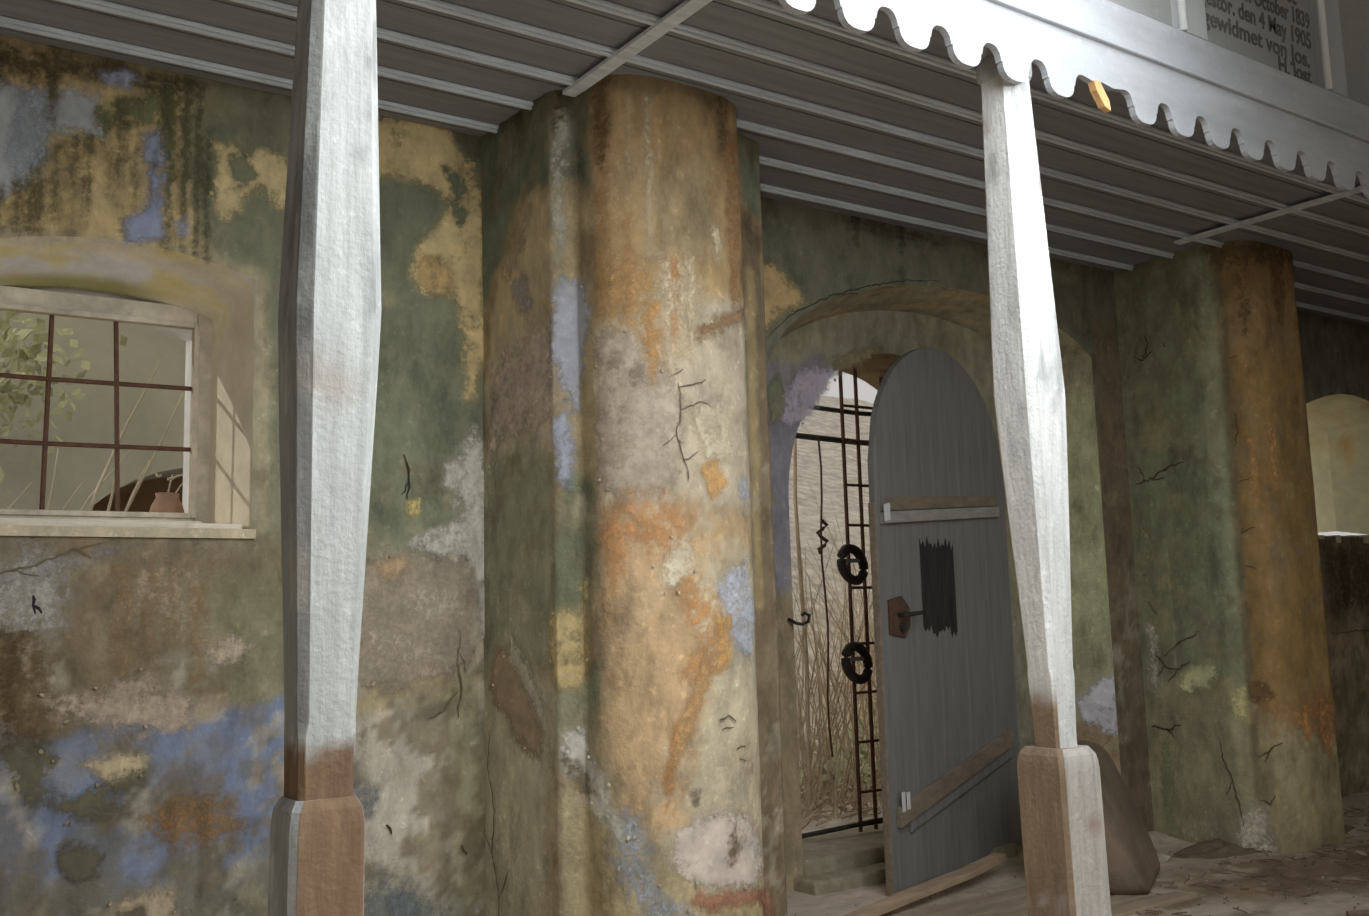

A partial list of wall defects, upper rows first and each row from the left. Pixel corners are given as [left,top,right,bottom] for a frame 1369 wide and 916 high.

flaking render [0,69,135,201]
damp [0,41,212,261]
peeling [378,117,731,502]
corrosion [701,460,727,499]
damp [0,621,55,749]
spalling [0,667,195,825]
flaking render [358,546,477,694]
spalling [549,578,590,689]
corrosion [664,577,733,794]
peeling [717,560,755,654]
peeling [1076,674,1118,736]
spalling [560,726,773,916]